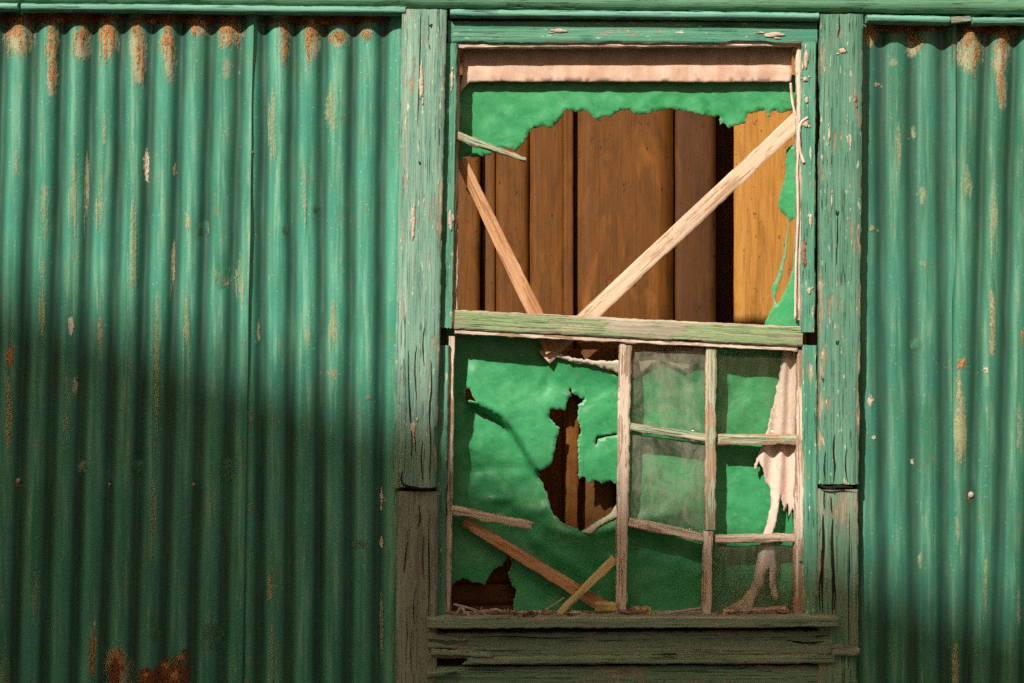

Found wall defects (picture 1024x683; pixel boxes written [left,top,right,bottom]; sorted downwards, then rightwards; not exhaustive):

rust [0,13,246,96]
rust [260,16,390,69]
rust [863,24,1021,110]
crack [400,322,435,673]
crack [787,434,853,644]
rust [89,620,192,683]